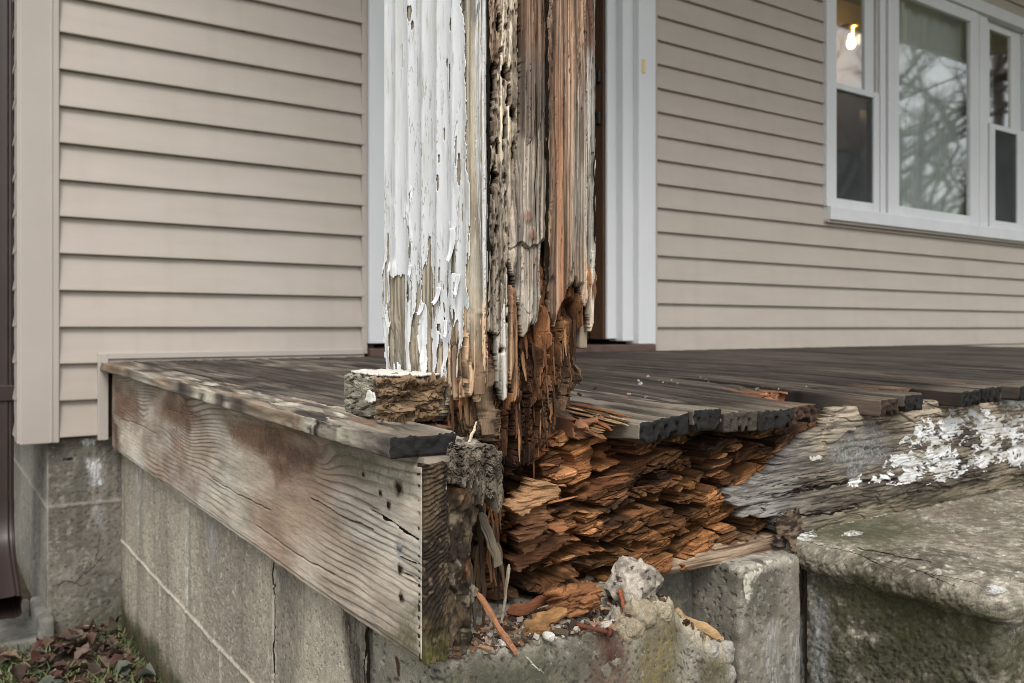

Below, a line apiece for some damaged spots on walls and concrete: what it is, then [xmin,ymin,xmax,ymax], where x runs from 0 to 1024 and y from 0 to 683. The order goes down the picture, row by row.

peeling [351,0,470,392]
peeling [365,390,376,403]
peeling [809,400,1024,487]
crack [270,562,278,683]
spalling [614,595,676,644]
spalling [703,638,736,683]